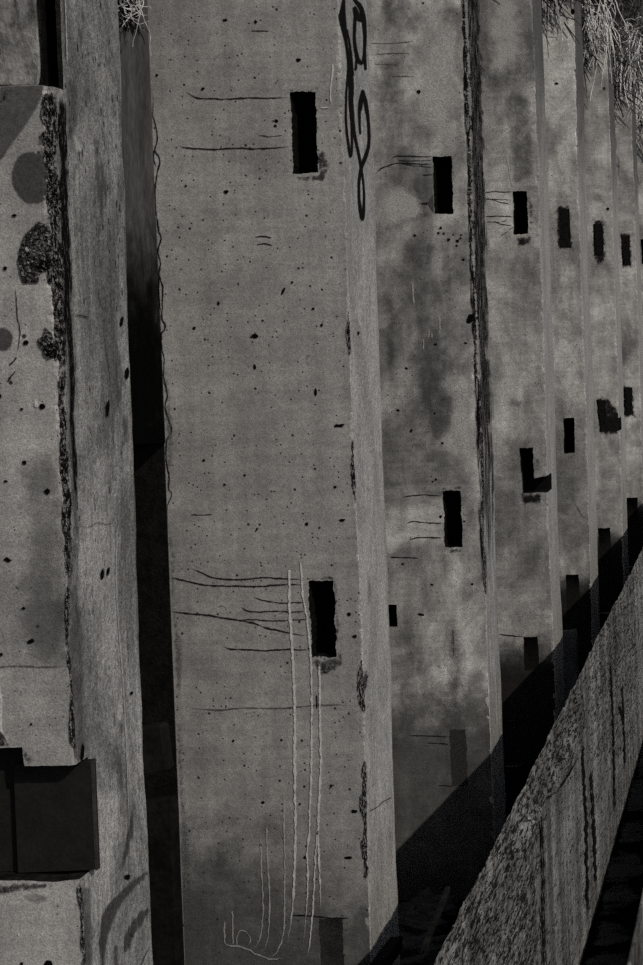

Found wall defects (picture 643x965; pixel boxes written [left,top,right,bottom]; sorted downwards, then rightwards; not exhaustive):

crack [187,92,282,100]
crack [181,135,283,150]
crack [152,106,173,519]
spalling [3,92,85,761]
crack [172,569,307,651]
spalling [0,883,47,893]
spalling [77,883,86,965]